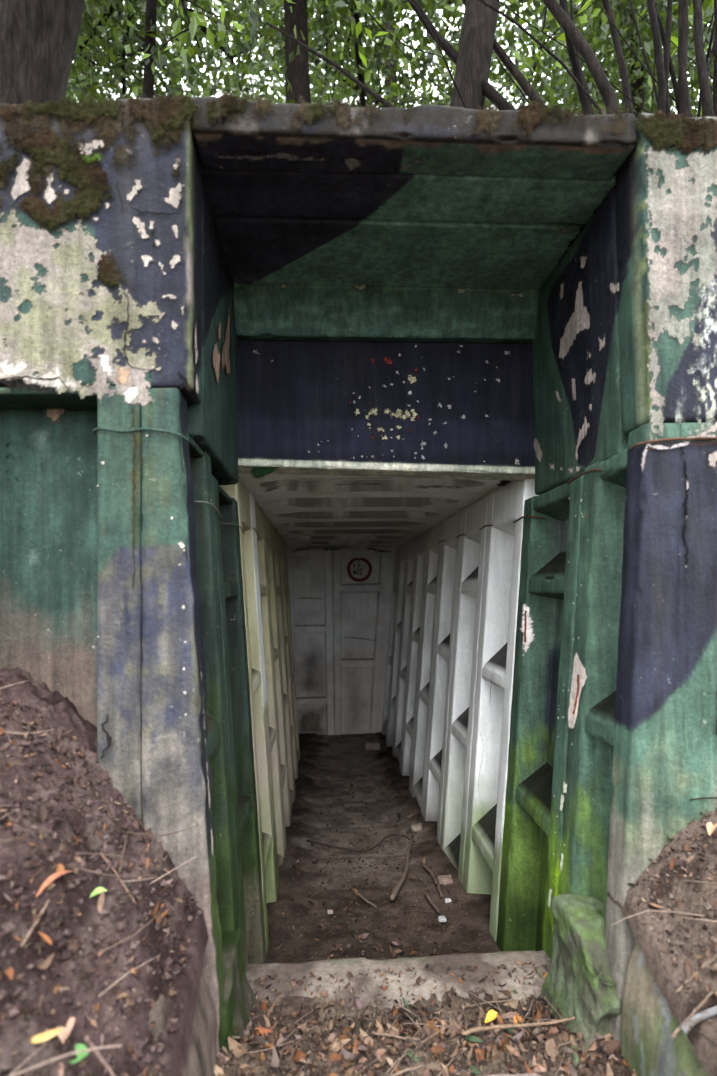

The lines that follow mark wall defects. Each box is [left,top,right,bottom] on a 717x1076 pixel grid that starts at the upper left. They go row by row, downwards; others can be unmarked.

peeling [79,140,104,155]
spalling [47,409,65,422]
peeling [0,158,184,406]
peeling [213,311,230,382]
peeling [349,353,448,459]
peeling [533,403,592,473]
peeling [559,281,590,360]
peeling [555,337,605,402]
peeling [641,147,717,471]
crack [680,447,689,565]
spalling [521,604,534,652]
spalling [558,637,587,729]